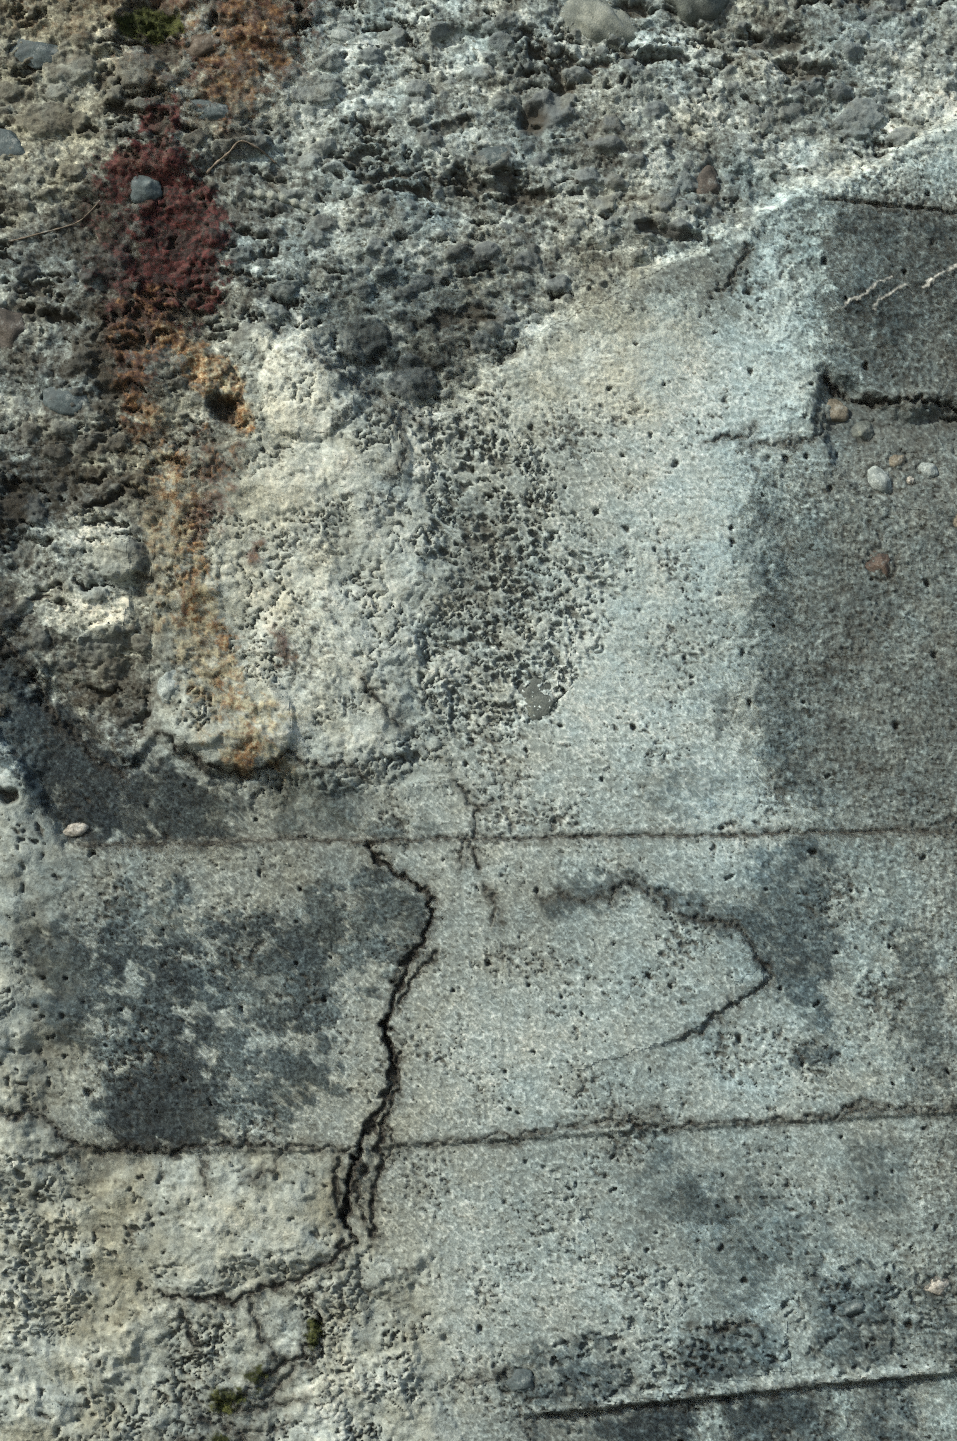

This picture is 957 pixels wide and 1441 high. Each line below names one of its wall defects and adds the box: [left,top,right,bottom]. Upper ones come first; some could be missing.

corrosion [147,0,315,130]
corrosion [86,94,288,776]
crack [824,376,957,420]
water stain [0,465,254,849]
corrosion [273,633,297,665]
water stain [271,755,438,839]
water stain [536,116,957,1102]
water stain [18,865,436,1159]
crack [0,786,957,1441]
water stain [497,1136,957,1441]